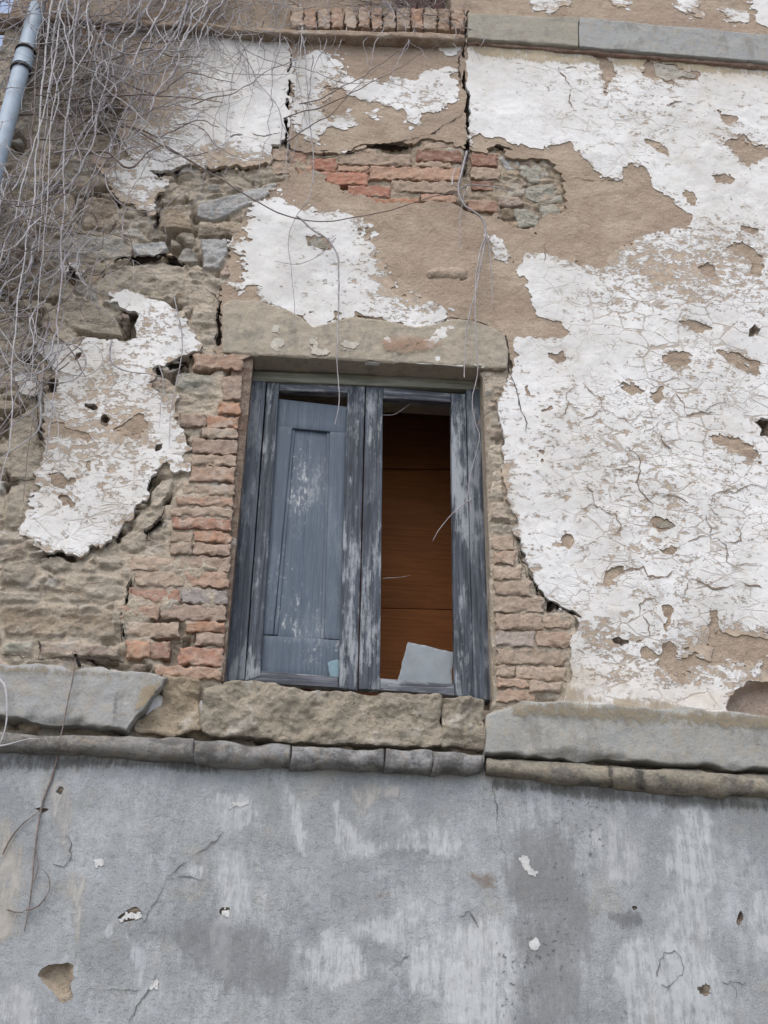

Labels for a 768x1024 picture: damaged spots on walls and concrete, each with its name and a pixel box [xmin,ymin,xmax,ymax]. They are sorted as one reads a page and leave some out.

crack [323,14,504,176]
peeling [263,0,768,367]
crack [206,289,222,346]
peeling [213,216,271,361]
peeling [620,382,664,404]
peeling [709,434,762,465]
crack [562,383,762,634]
peeling [650,517,676,533]
crack [518,550,580,618]
peeling [636,605,768,717]
crack [142,831,225,923]
spalling [38,963,74,1003]